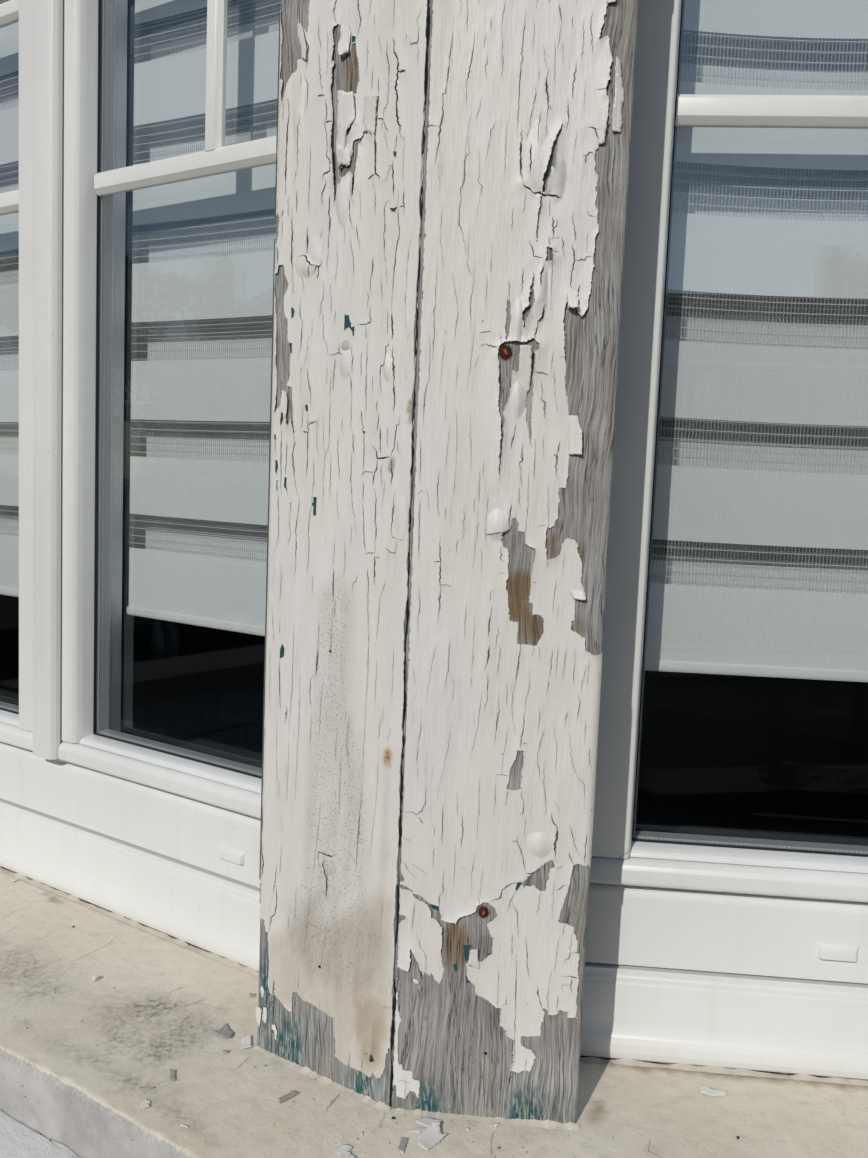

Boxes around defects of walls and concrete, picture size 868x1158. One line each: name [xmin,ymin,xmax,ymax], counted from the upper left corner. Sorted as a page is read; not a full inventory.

peeling [281,0,310,97]
peeling [333,21,378,191]
peeling [274,265,309,441]
peeling [498,0,635,655]
crack [261,0,605,1154]
peeling [241,860,588,1150]